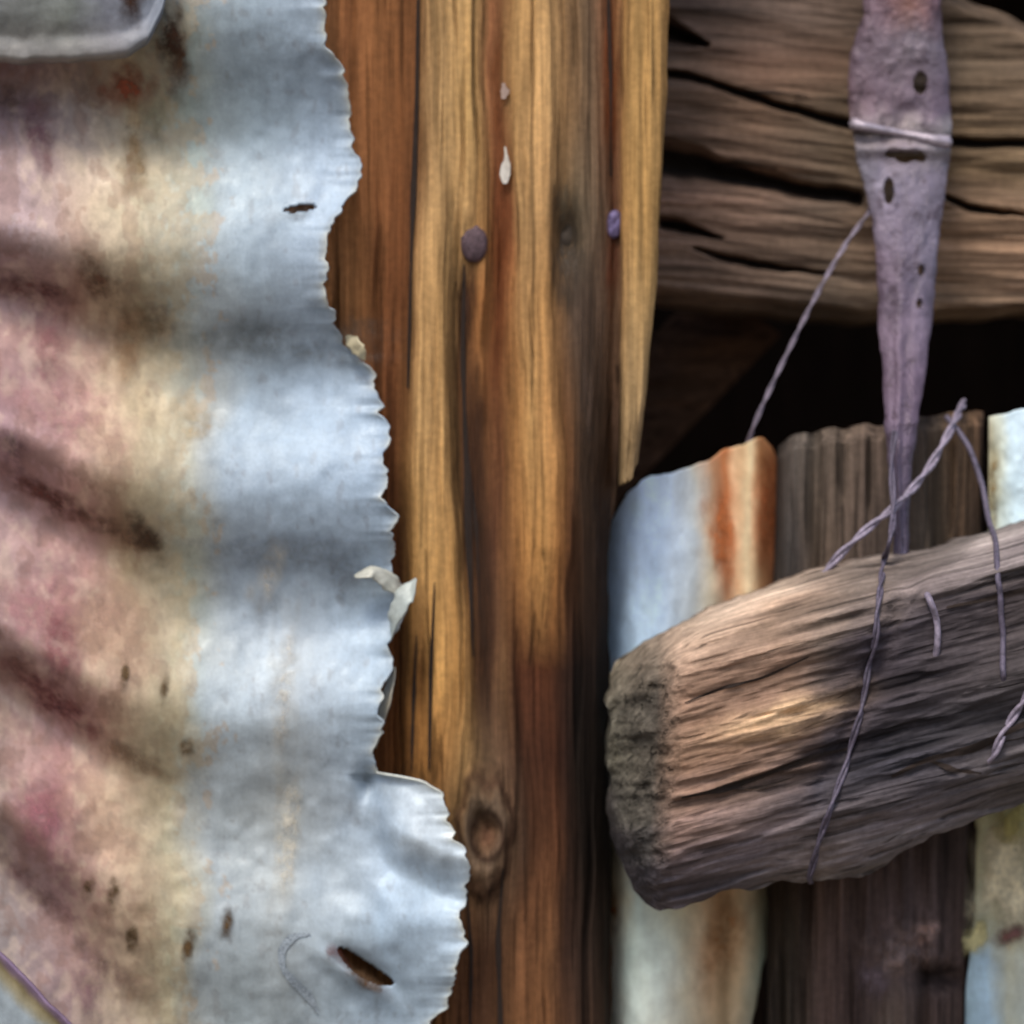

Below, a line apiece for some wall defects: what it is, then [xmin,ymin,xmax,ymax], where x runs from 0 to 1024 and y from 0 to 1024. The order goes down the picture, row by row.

crack [668,26,707,47]
crack [667,72,850,128]
crack [951,138,1024,147]
crack [662,150,862,205]
crack [946,196,1024,217]
crack [660,220,826,275]
corrosion [712,501,733,571]
corrosion [223,912,233,935]
corrosion [126,928,137,950]
corrosion [183,930,194,957]